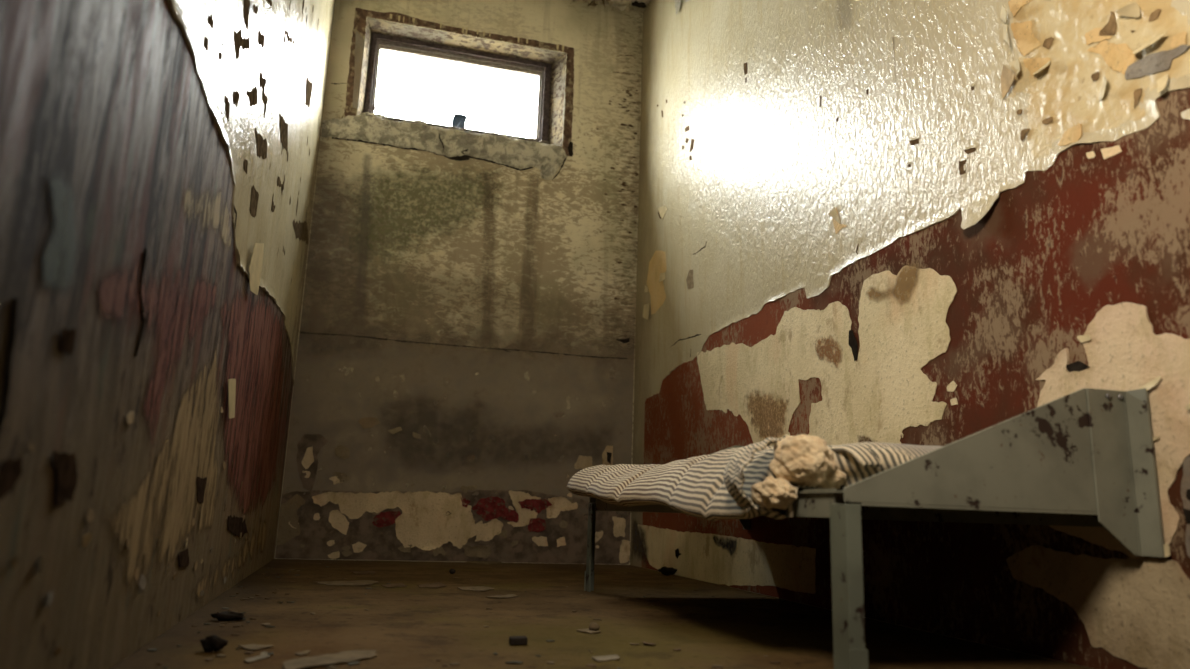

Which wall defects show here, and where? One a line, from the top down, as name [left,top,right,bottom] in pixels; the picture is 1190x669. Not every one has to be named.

peeling [0,0,832,669]
damp [282,168,634,516]
peeling [644,74,1190,465]
peeling [861,519,1148,669]
peeling [1146,455,1190,580]